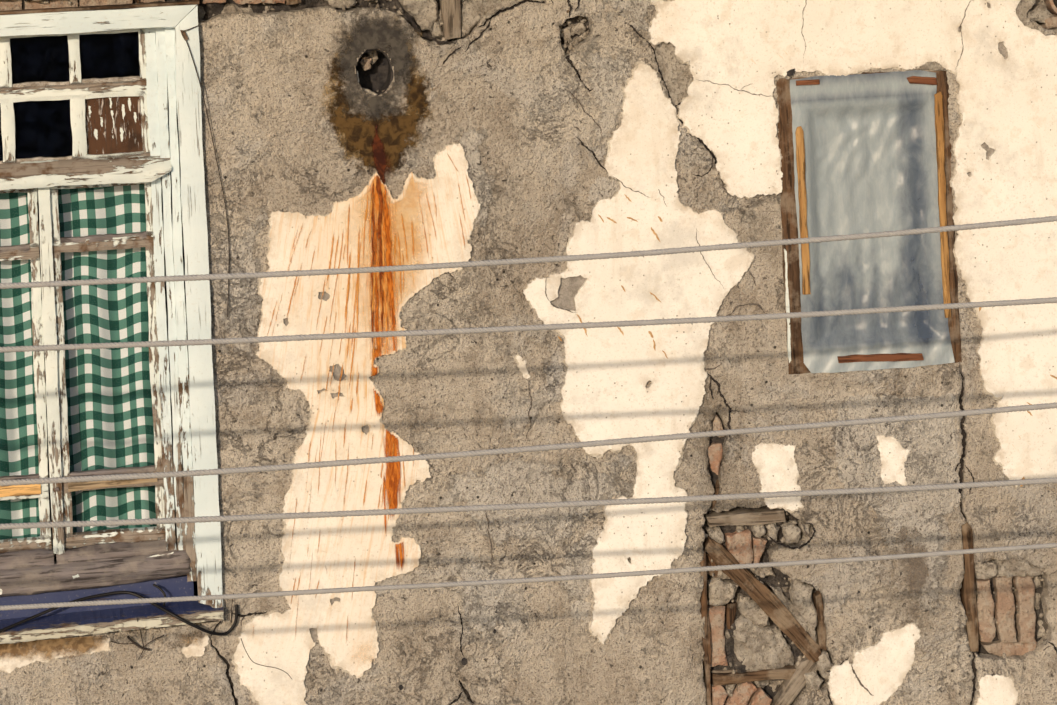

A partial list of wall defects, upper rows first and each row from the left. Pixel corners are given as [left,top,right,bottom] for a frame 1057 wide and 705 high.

spalling [0,0,504,42]
corrosion [308,176,437,499]
flaking render [523,0,1057,658]
flaking render [231,143,481,705]
corrosion [372,430,414,532]
crack [955,371,974,519]
corrosion [395,542,404,569]
flaking render [461,562,505,635]
spalling [700,412,921,705]
crack [210,611,267,705]
crack [970,651,978,705]
flaking render [974,674,1019,705]